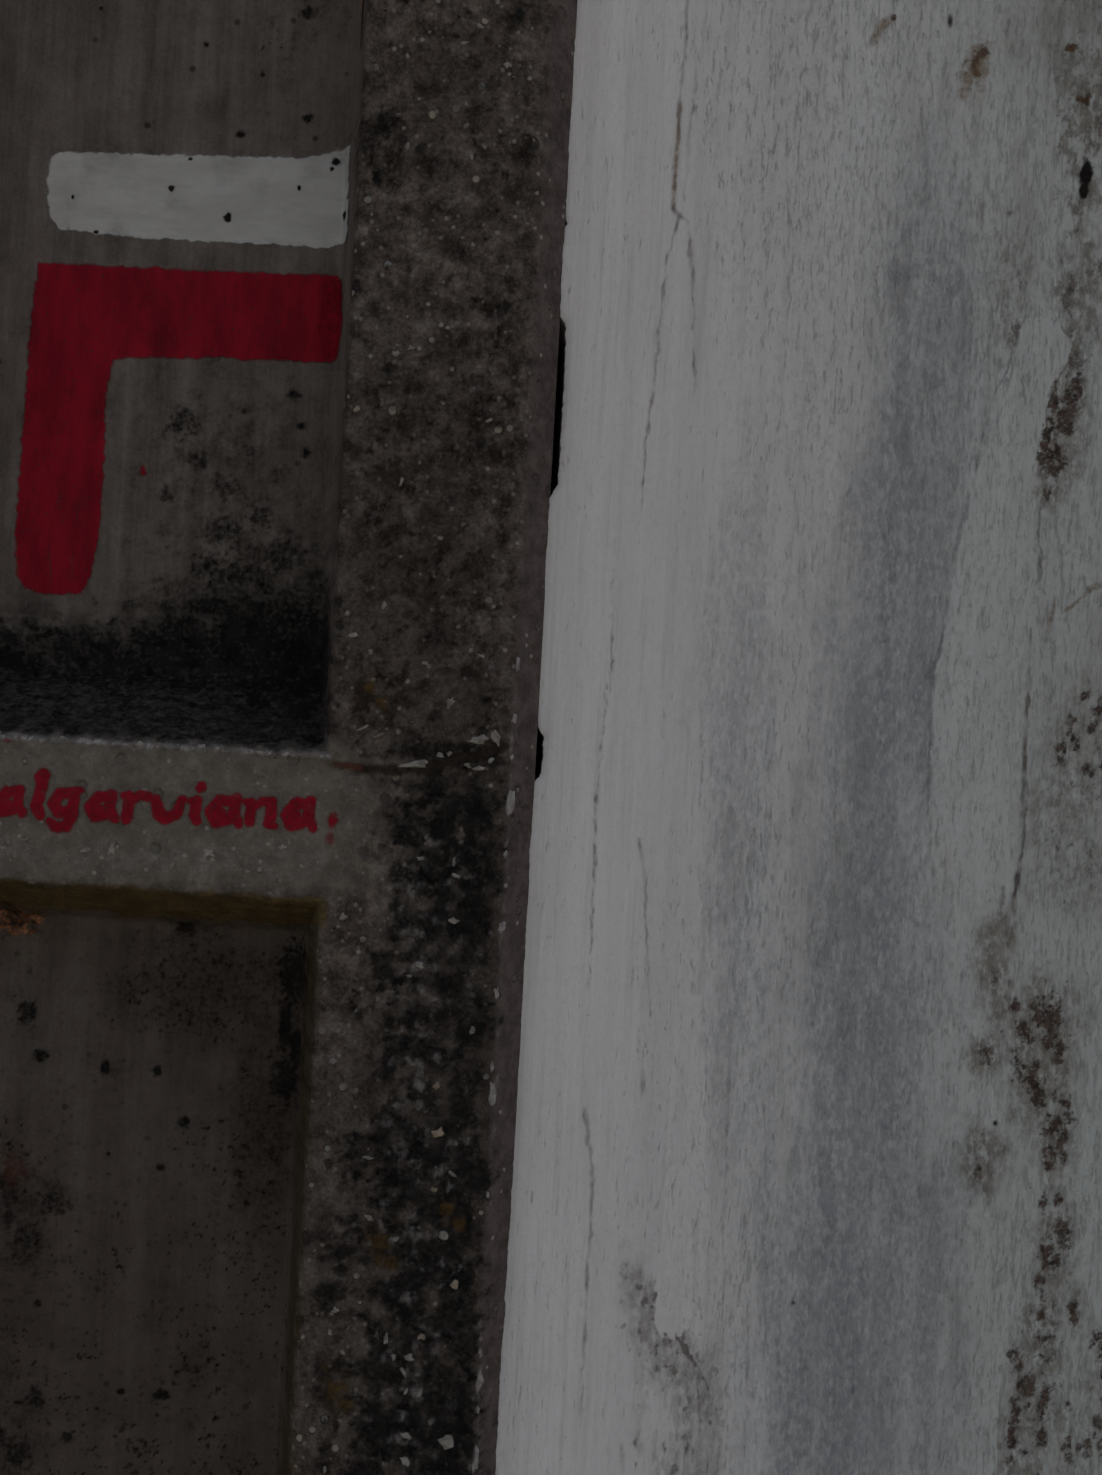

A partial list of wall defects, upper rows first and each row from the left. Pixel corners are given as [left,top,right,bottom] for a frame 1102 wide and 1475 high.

crack [663,105,694,287]
rust [962,46,989,89]
rust [1057,21,1102,232]
damp [361,280,516,545]
damp [0,508,514,1475]